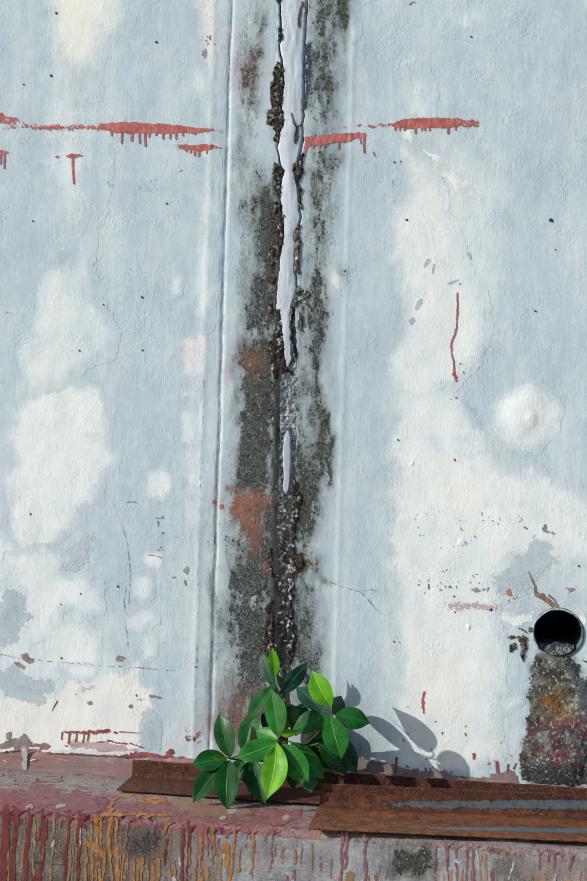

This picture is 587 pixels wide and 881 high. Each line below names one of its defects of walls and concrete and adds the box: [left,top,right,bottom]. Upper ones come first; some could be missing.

spalling [266,61,284,142]
spalling [267,153,304,285]
peeling [0,0,184,761]
spalling [137,286,312,680]
crack [272,370,281,654]
water stain [218,0,349,751]
peeling [357,64,587,783]
spalling [277,692,291,707]
water stain [519,652,587,787]
corrosion [7,793,332,881]
water stain [390,839,534,881]